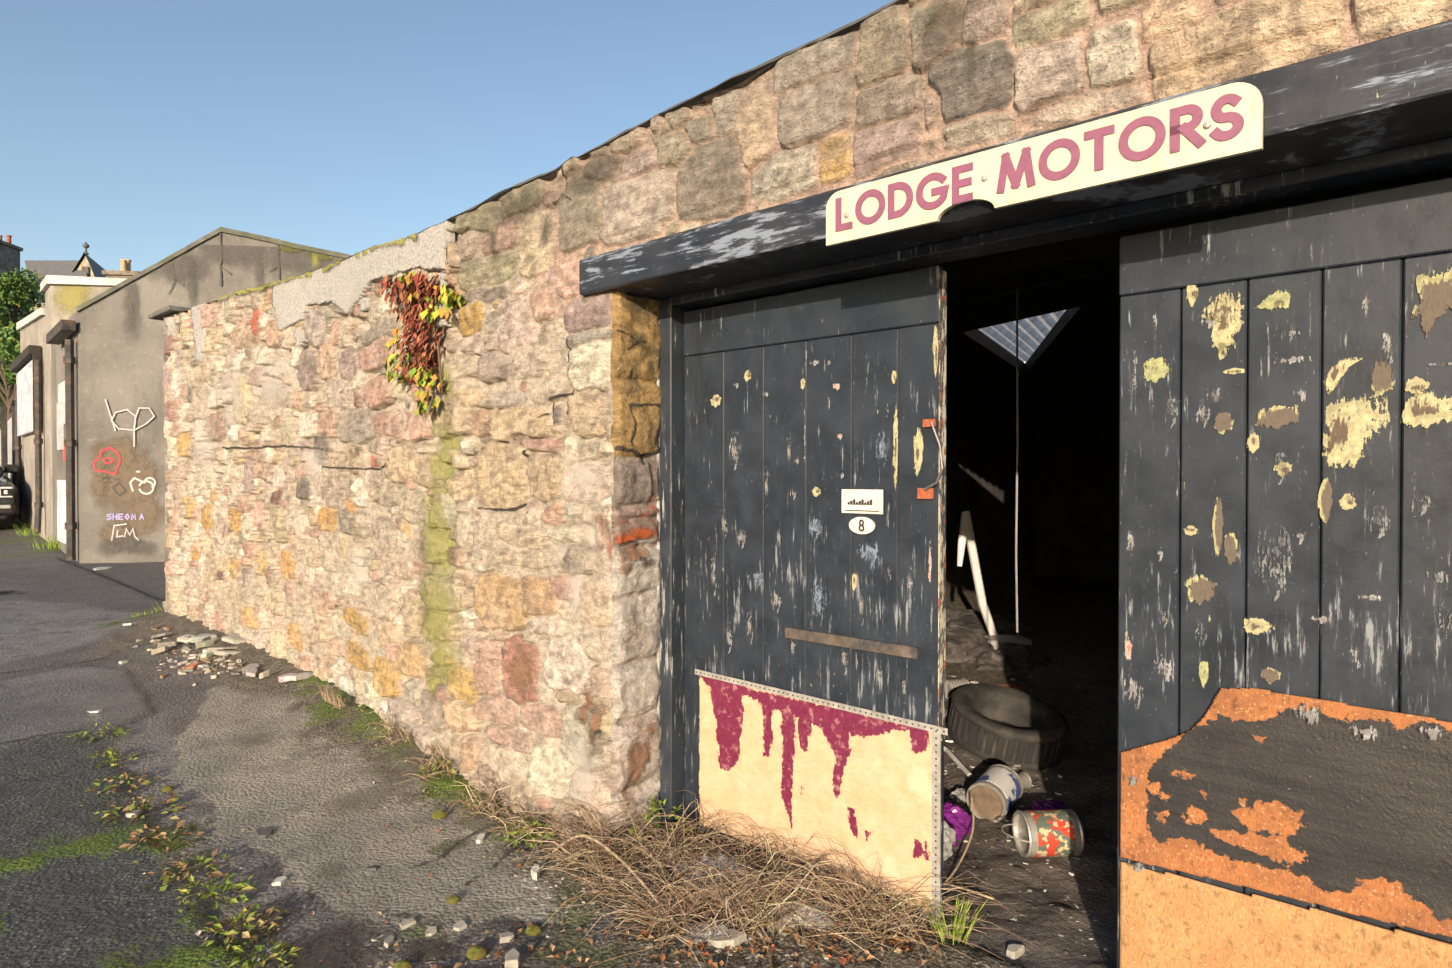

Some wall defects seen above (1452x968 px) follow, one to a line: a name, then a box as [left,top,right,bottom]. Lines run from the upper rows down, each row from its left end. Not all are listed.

peeling [272,221,455,348]
peeling [1411,267,1452,338]
peeling [1132,351,1172,385]
peeling [1186,285,1291,434]
crack [615,403,660,506]
peeling [1247,390,1306,454]
peeling [1273,452,1292,485]
peeling [1317,294,1452,539]
peeling [1183,497,1304,605]
peeling [1124,637,1132,660]
peeling [1195,624,1209,688]
peeling [1244,617,1275,635]